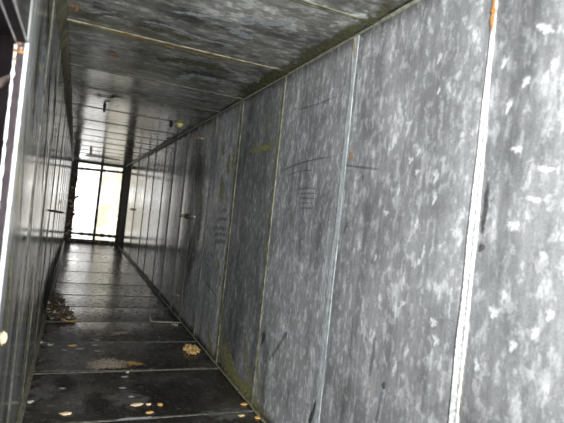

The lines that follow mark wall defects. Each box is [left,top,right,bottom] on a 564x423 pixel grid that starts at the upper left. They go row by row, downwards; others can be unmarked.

water stain [309,63,359,423]